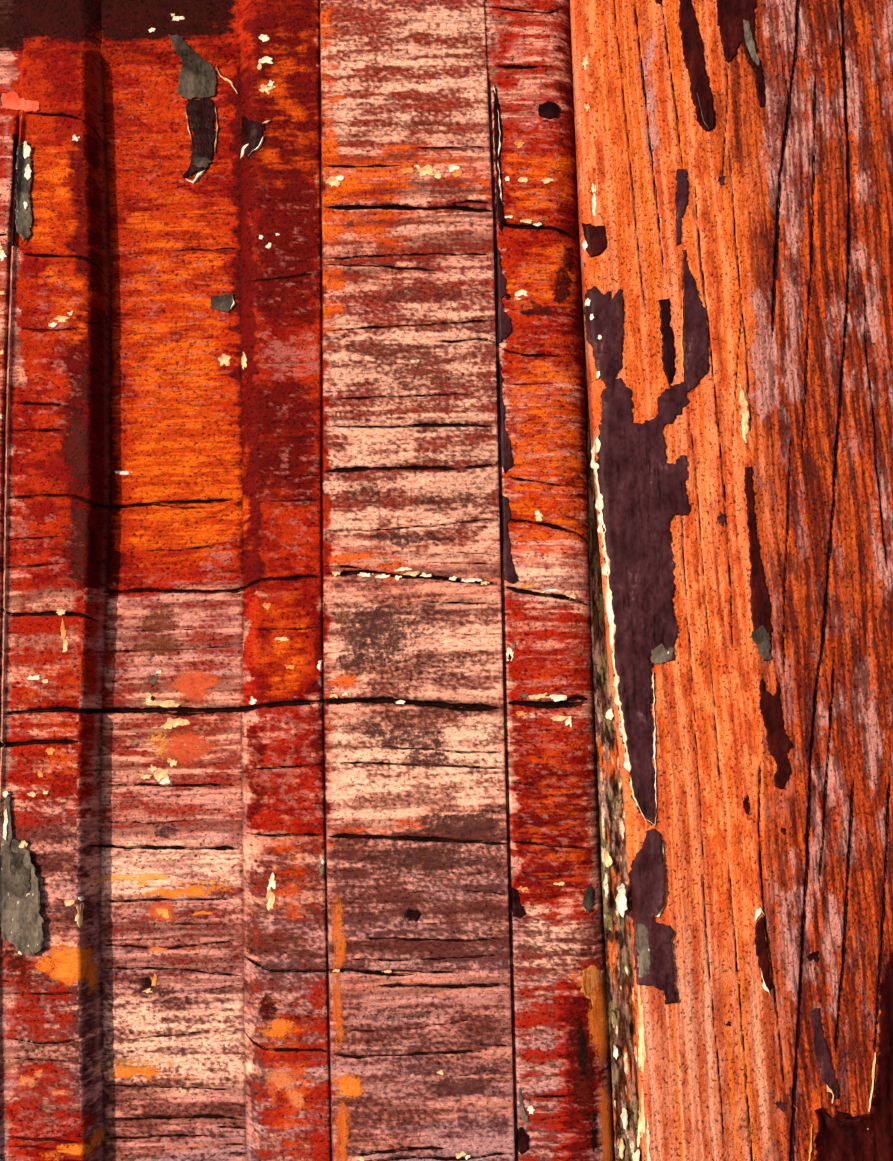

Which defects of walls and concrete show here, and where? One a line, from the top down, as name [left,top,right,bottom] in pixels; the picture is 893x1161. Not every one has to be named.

peeling [168,13,237,184]
peeling [679,0,716,131]
peeling [716,0,766,107]
crack [1,536,64,567]
crack [1,491,229,509]
crack [262,463,562,502]
crack [334,518,587,542]
peeling [582,169,709,1005]
crack [614,0,890,1161]
crack [0,695,589,748]
peeling [0,790,44,956]
peeling [808,952,893,1161]